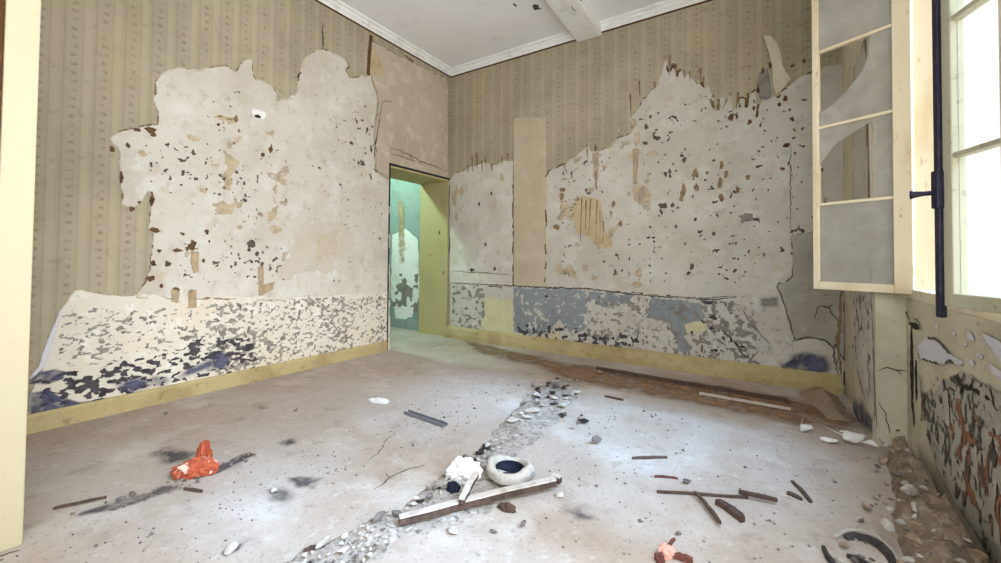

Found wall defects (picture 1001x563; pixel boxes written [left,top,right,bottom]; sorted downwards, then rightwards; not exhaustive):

flaking render [215,115,240,133]
flaking render [251,108,266,120]
flaking render [574,172,622,275]
flaking render [631,118,661,147]
crack [451,121,845,375]
flaking render [658,152,728,214]
flaking render [728,62,796,132]
peeling [851,39,876,421]
peeling [28,229,431,414]
peeling [443,264,794,368]
damp [782,354,828,373]
flaking render [905,311,1001,563]